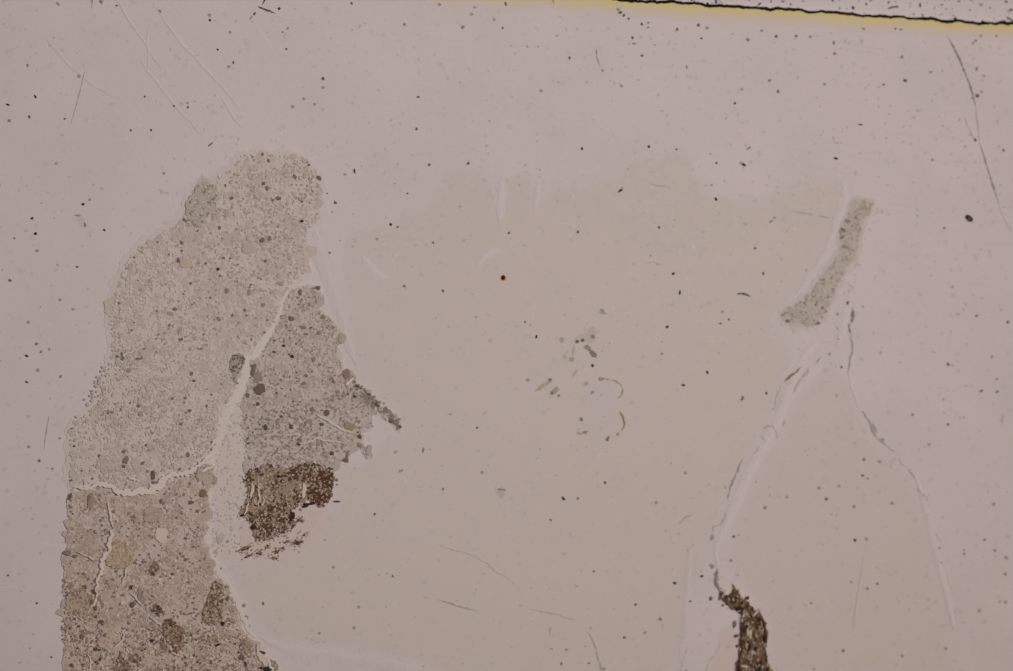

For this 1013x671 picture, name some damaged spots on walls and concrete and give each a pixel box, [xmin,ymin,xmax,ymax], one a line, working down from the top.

crack [72,281,298,638]
peeling [235,516,308,561]